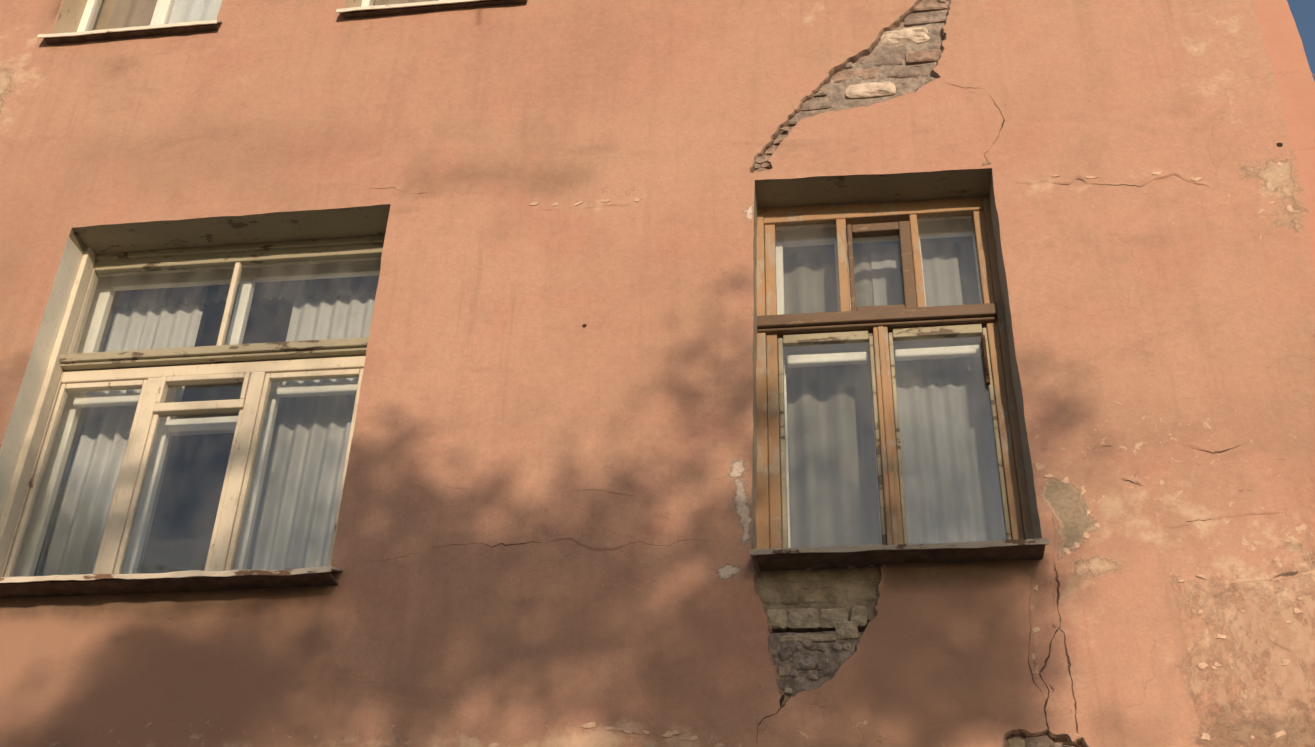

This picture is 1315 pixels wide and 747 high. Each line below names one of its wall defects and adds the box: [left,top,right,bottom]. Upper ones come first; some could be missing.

spalling [749,0,952,173]
crack [948,83,1005,166]
peeling [1246,161,1301,231]
peeling [728,459,752,542]
flaking render [1038,474,1115,577]
crack [1164,502,1285,528]
spalling [718,564,884,708]
crack [1028,518,1079,734]
spalling [1002,728,1089,747]
flaking render [1200,718,1315,747]